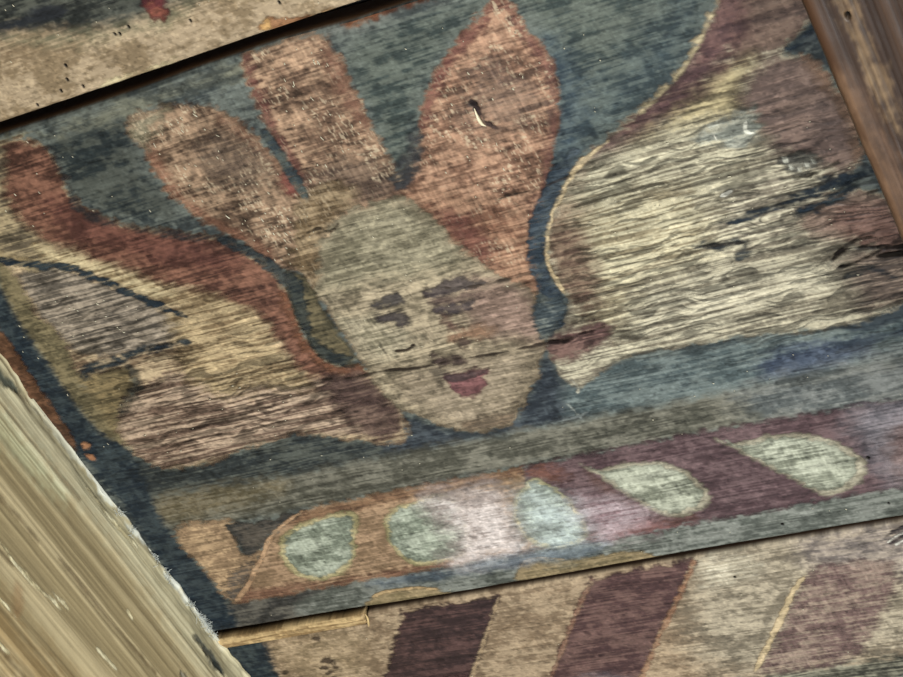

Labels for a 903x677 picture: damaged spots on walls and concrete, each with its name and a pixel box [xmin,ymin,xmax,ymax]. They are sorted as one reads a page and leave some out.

crack [831,236,903,268]